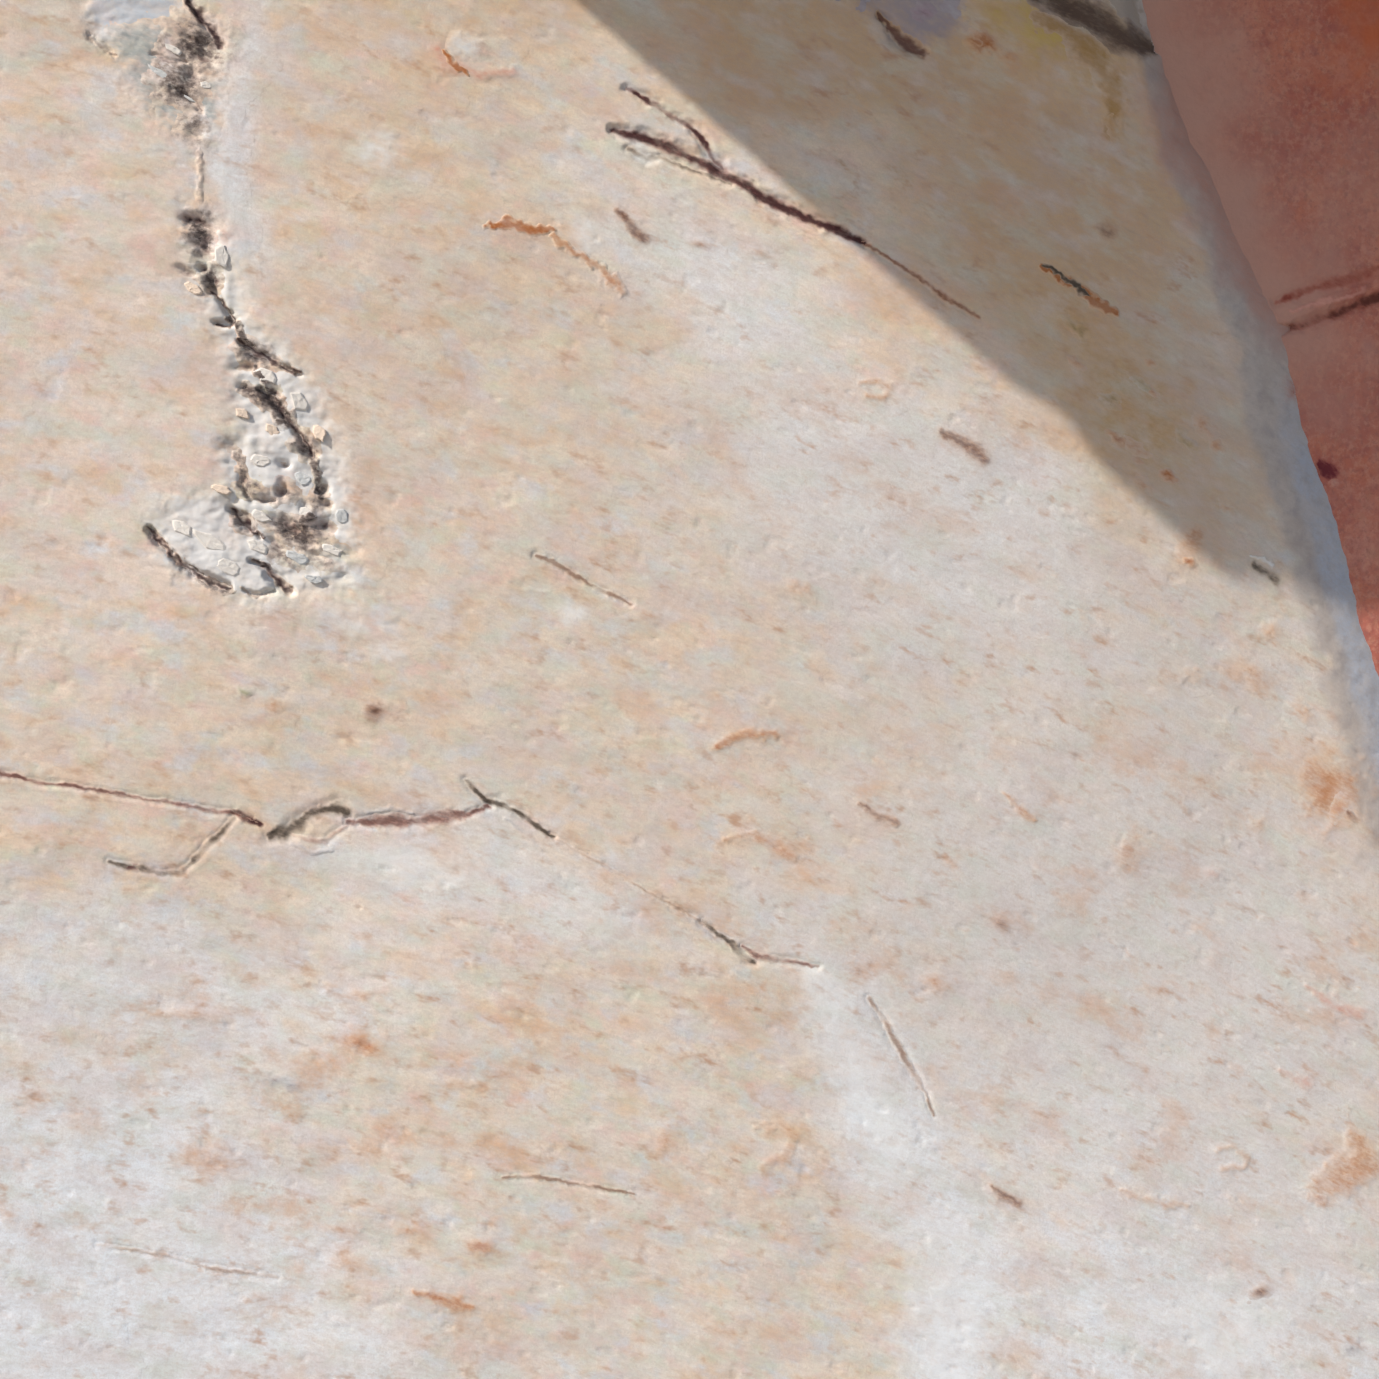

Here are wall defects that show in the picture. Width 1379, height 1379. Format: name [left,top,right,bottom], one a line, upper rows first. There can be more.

peeling [830,0,972,76]
peeling [1026,0,1172,92]
crack [598,80,984,325]
flaking render [62,0,452,669]
crack [0,760,820,977]
crack [864,994,937,1120]